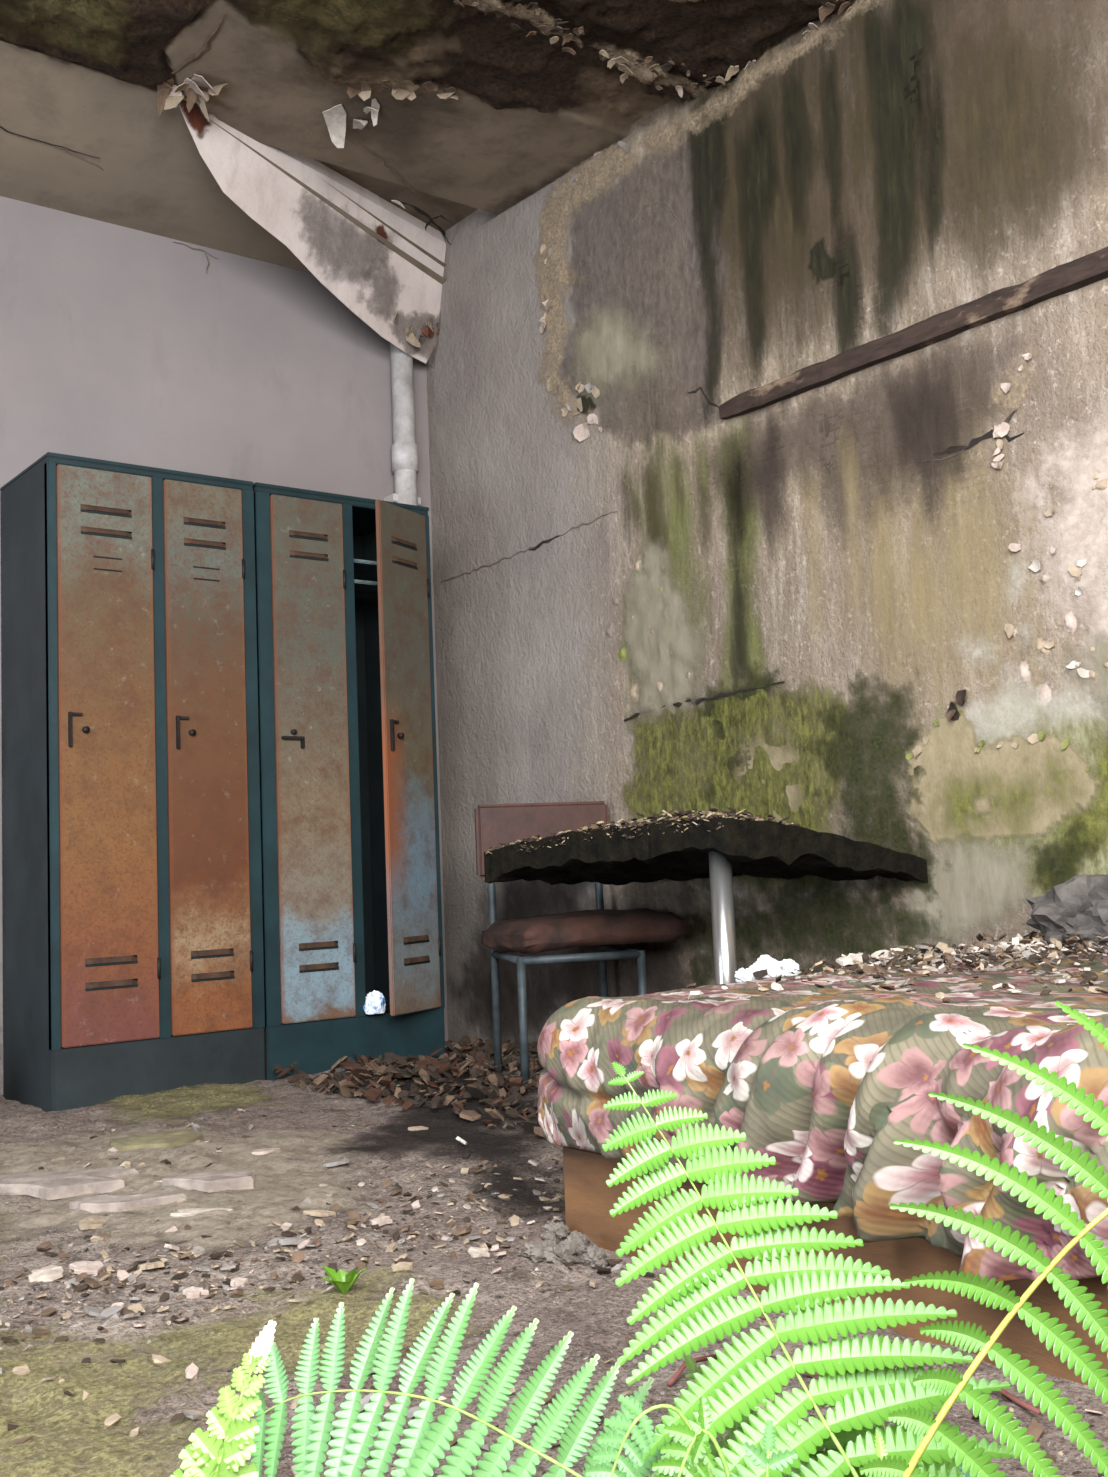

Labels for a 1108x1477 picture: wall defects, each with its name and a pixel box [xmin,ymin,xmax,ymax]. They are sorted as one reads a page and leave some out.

water stain [0,0,124,61]
spalling [0,0,276,138]
water stain [303,200,397,317]
peeling [293,0,879,442]
water stain [691,0,1106,402]
water stain [704,343,997,540]
crack [916,407,1024,463]
crack [441,511,617,582]
spalling [906,689,1100,943]